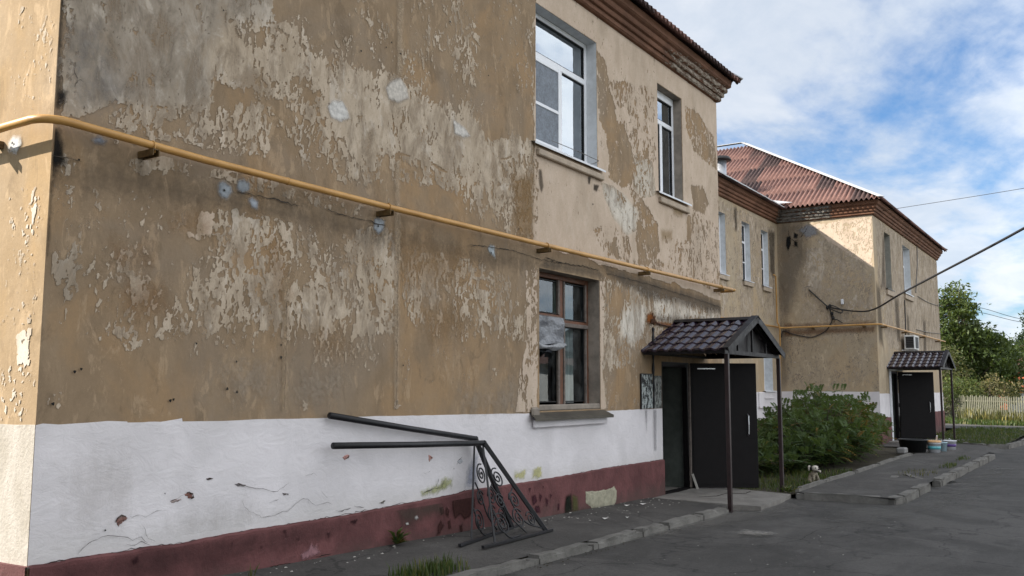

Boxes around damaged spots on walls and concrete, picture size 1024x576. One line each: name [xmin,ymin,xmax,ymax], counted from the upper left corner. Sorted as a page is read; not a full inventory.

peeling [8,187,42,279]
crack [238,191,299,206]
peeling [14,0,775,412]
crack [470,244,723,309]
peeling [0,290,36,421]
crack [47,462,475,564]
spalling [586,487,617,508]